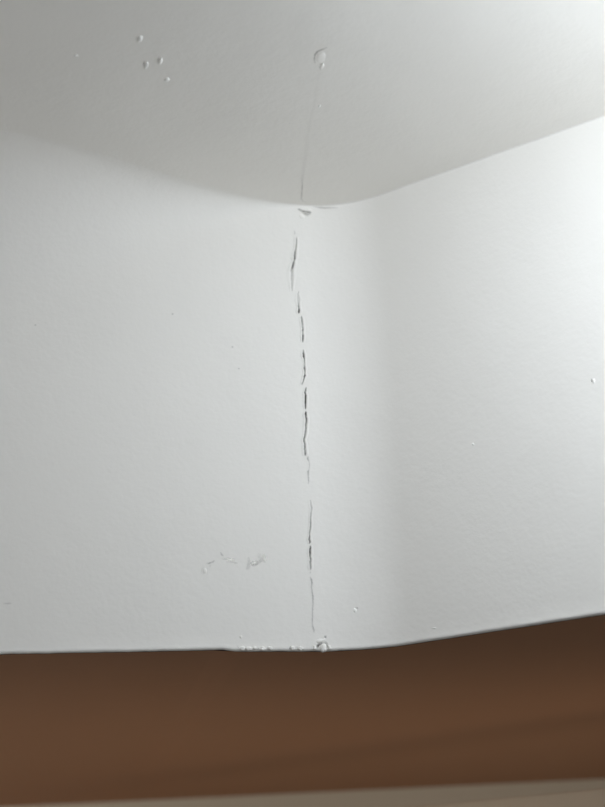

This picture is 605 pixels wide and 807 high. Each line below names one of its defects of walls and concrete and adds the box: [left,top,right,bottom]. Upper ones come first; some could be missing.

crack [286,237,310,456]
crack [306,501,314,570]